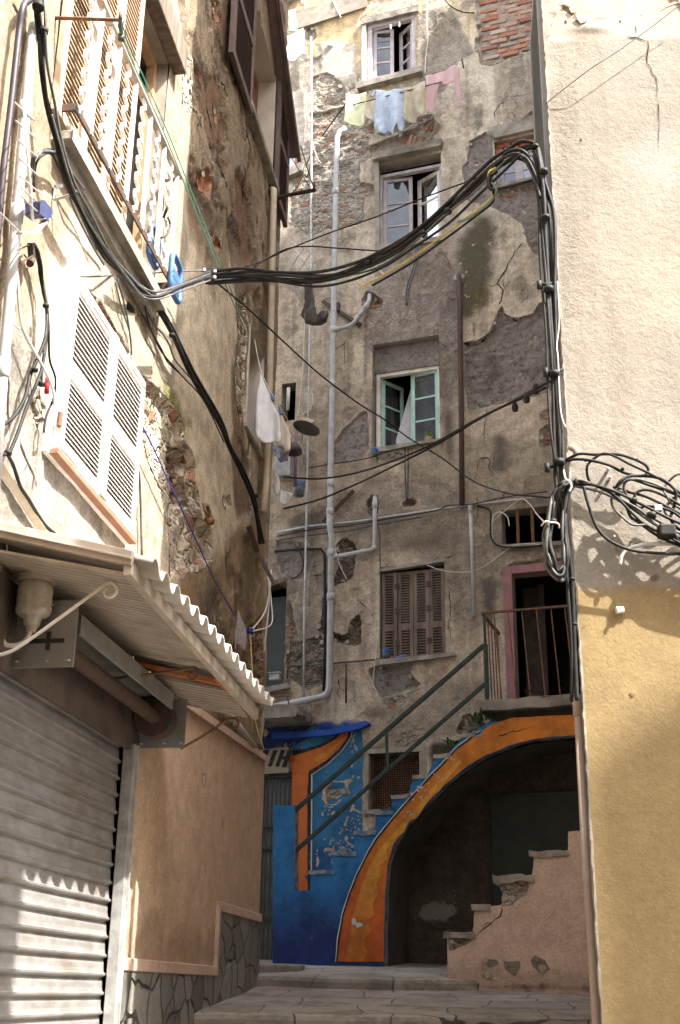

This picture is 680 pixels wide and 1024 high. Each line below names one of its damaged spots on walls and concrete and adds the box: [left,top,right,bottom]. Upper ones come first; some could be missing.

flaking render [474,0,532,66]
crack [627,25,659,148]
flaking render [462,132,539,255]
leakage [454,217,497,318]
crack [464,243,528,346]
flaking render [463,300,563,410]
spalling [165,447,187,508]
flaking render [368,663,420,697]
spalling [321,784,349,816]